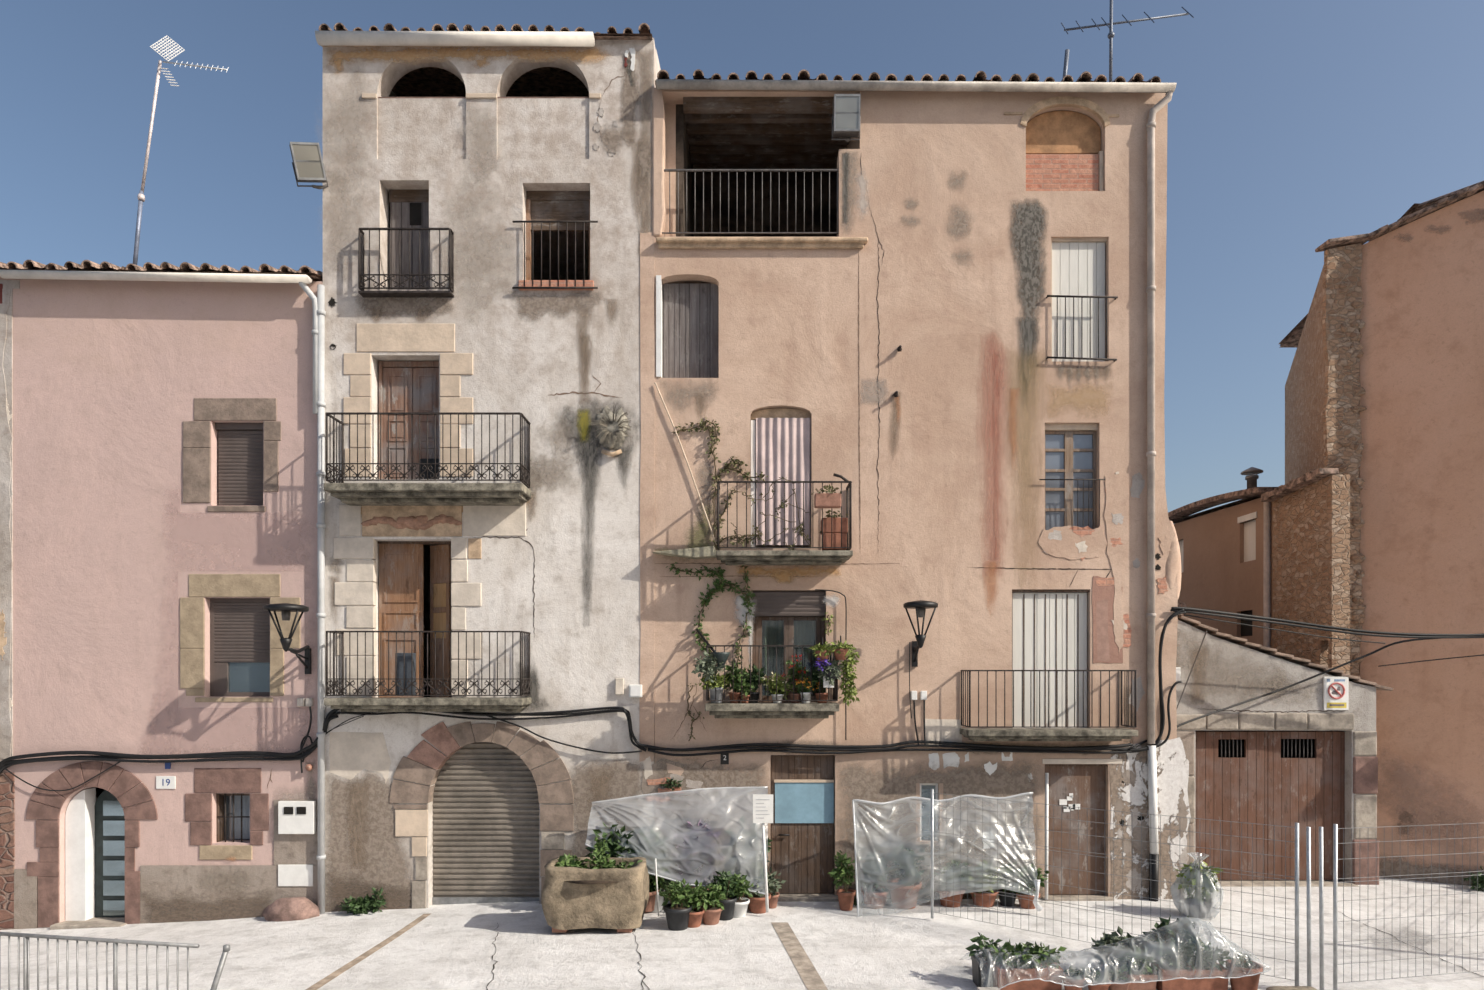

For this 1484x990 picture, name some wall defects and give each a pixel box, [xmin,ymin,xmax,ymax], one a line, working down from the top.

damp [518,292,637,598]
crack [655,158,900,577]
rust [984,341,1004,567]
damp [1010,200,1045,399]
spalling [1038,472,1145,663]
damp [309,770,413,912]
peeling [929,752,1013,775]
peeling [983,832,995,849]
spalling [1129,676,1145,711]
peeling [1110,737,1191,899]
crack [486,923,499,990]
crack [634,929,648,989]